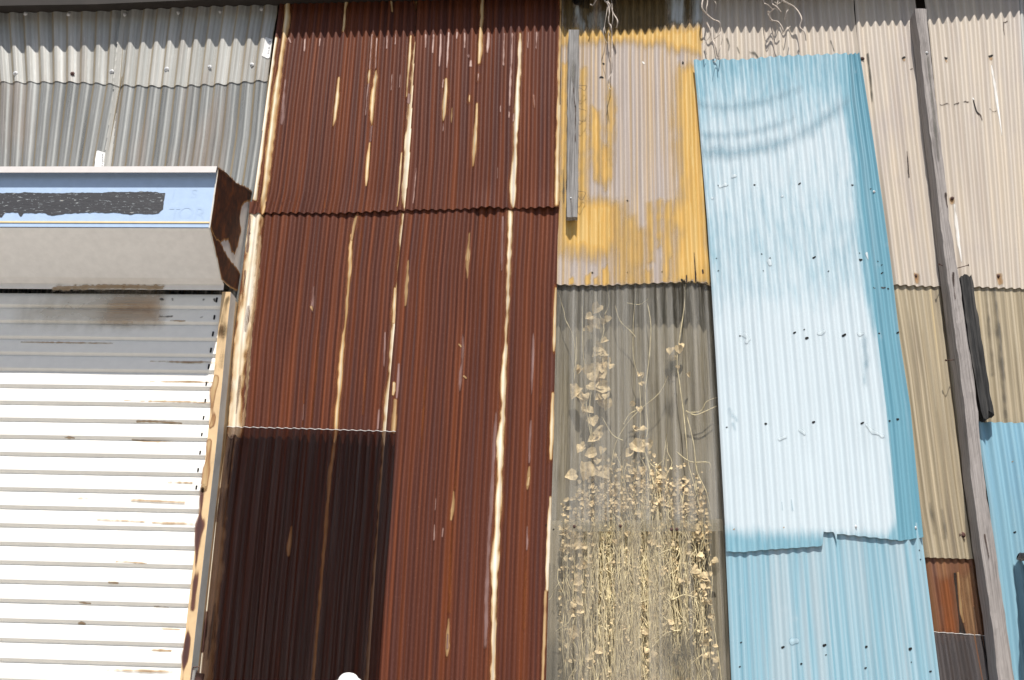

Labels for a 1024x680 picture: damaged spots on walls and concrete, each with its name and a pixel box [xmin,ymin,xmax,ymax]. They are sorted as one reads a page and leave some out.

rust [210,168,252,307]